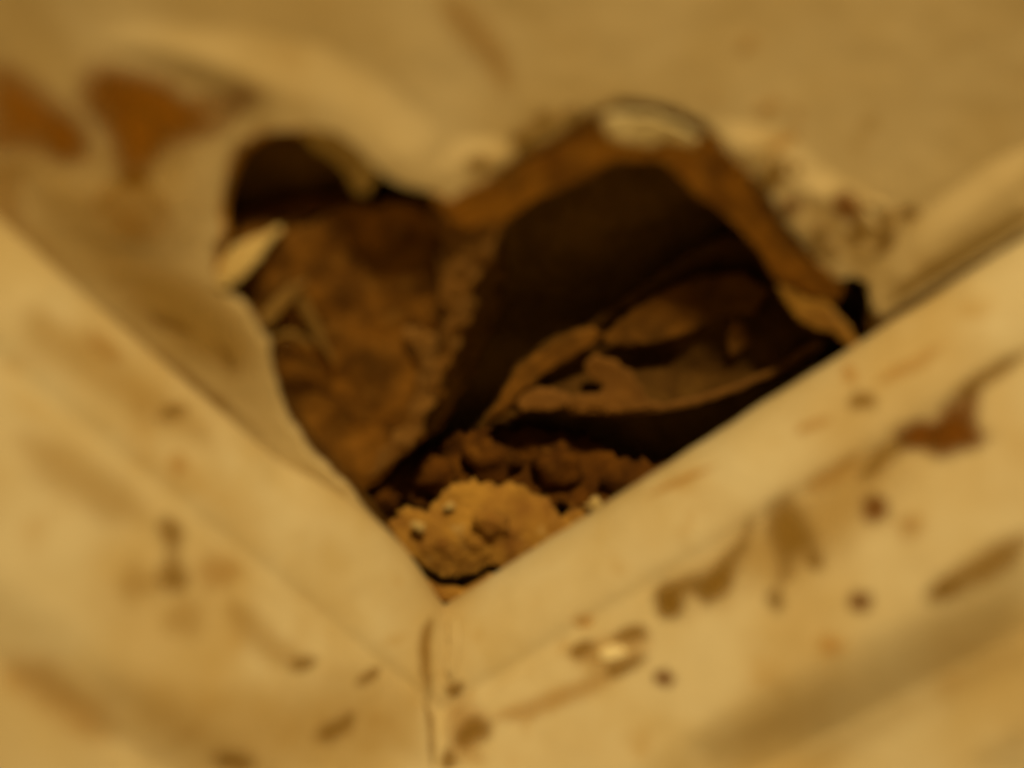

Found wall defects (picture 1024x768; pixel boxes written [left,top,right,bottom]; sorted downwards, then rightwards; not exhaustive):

damp [0,74,80,154]
damp [86,73,211,178]
spalling [429,108,871,366]
spalling [215,127,427,541]
spalling [555,504,582,516]
spalling [414,559,499,587]
damp [702,574,729,600]